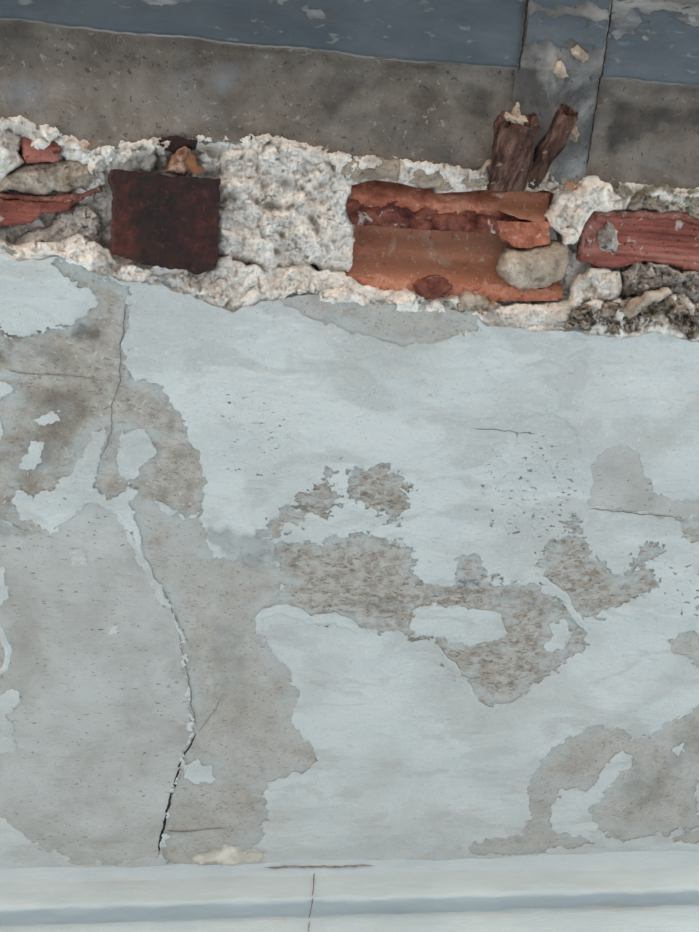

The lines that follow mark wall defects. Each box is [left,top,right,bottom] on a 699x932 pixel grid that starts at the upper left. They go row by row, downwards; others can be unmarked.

peeling [302,4,326,19]
peeling [608,8,652,41]
spalling [0,115,90,161]
peeling [0,133,699,867]
crack [158,589,223,852]
crack [265,864,372,932]